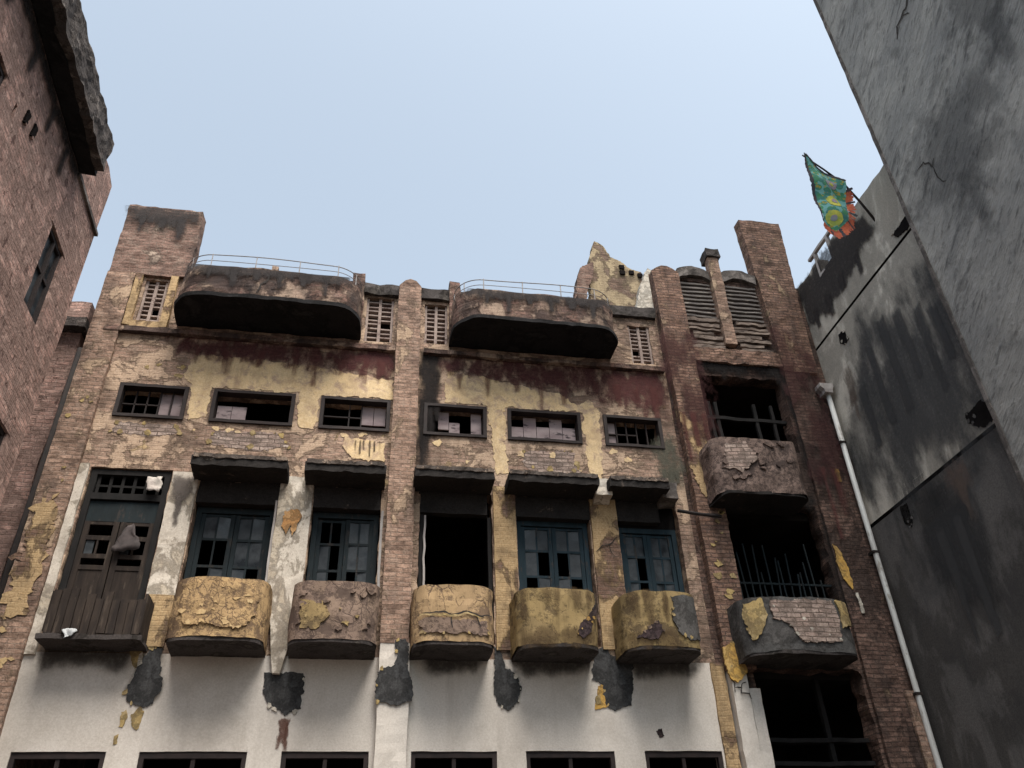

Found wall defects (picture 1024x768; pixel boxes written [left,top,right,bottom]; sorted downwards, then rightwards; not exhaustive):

damp [797,216,873,327]
damp [167,337,395,384]
damp [440,330,704,418]
damp [683,386,714,459]
damp [809,264,1002,642]
peeling [0,466,66,633]
flaking render [713,544,865,644]
spalling [113,647,164,745]
spalling [263,672,305,716]
spalling [374,638,414,706]
spalling [494,647,522,711]
spalling [591,647,634,711]